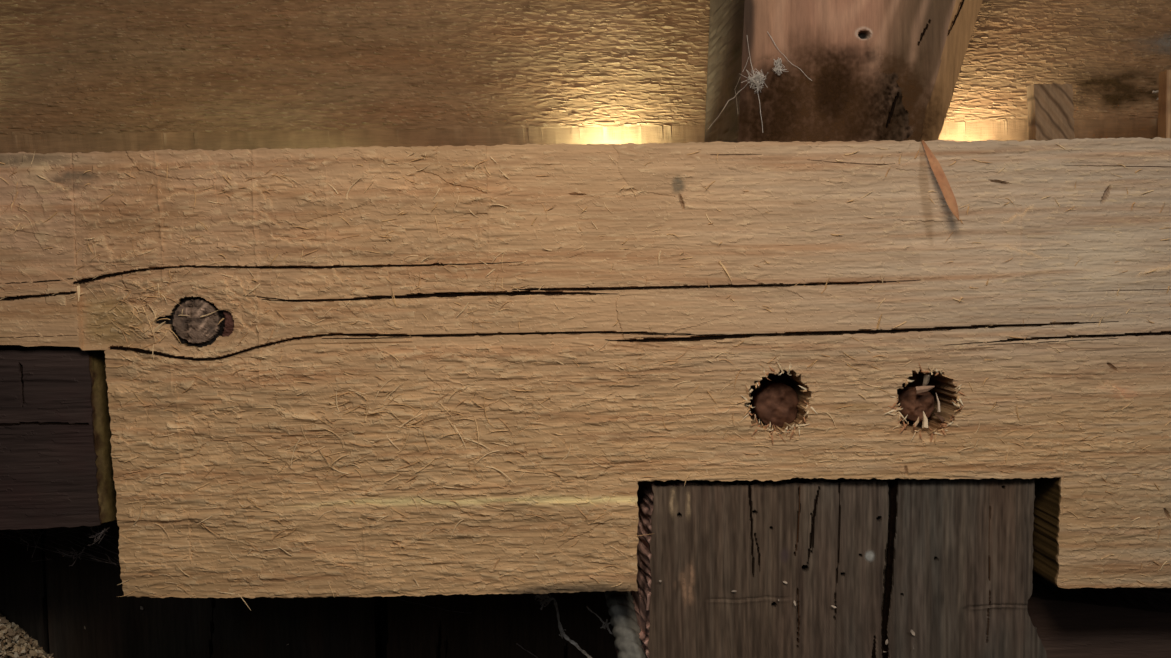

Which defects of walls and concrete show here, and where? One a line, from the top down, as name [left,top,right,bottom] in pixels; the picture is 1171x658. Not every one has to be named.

crack [0,262,917,302]
crack [0,335,89,426]
crack [110,321,1171,361]
crack [872,478,898,658]